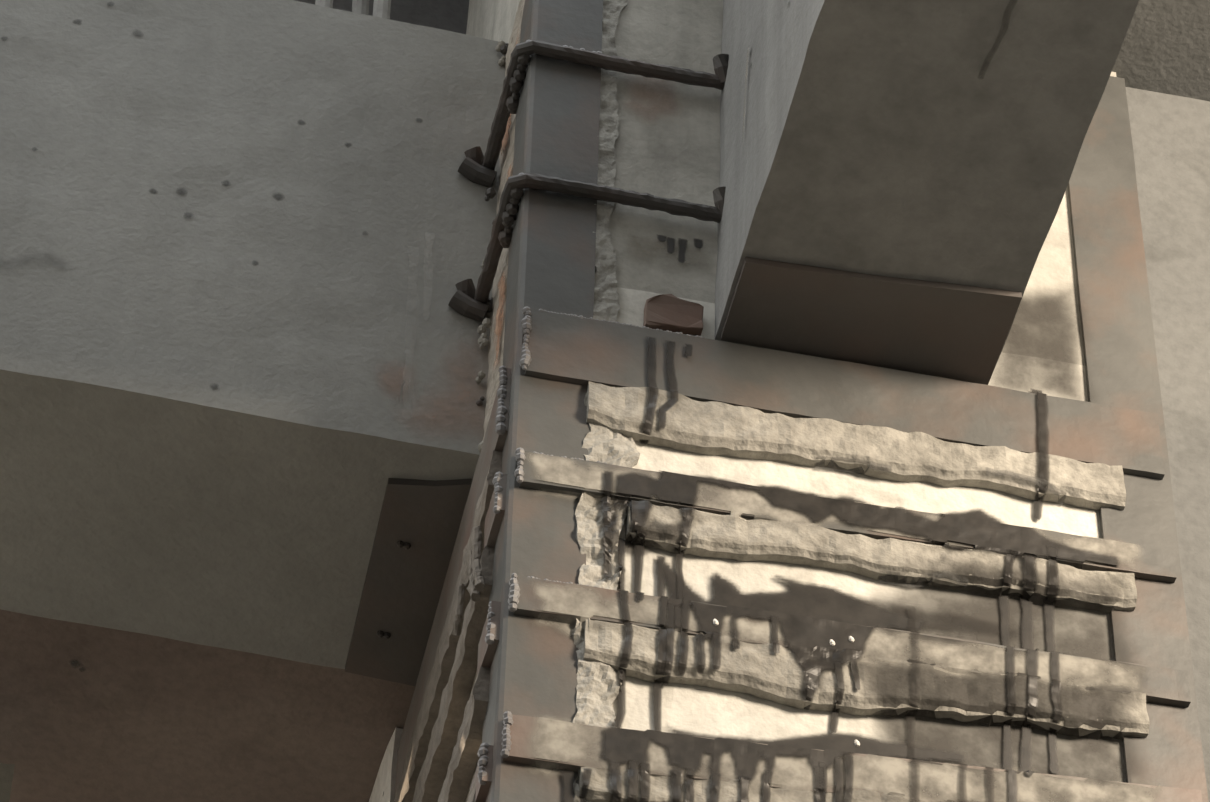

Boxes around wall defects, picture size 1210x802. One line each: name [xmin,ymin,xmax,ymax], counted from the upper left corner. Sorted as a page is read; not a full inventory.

spalling [495,0,525,77]
crack [980,0,1017,78]
spalling [485,113,516,224]
spalling [475,248,509,452]